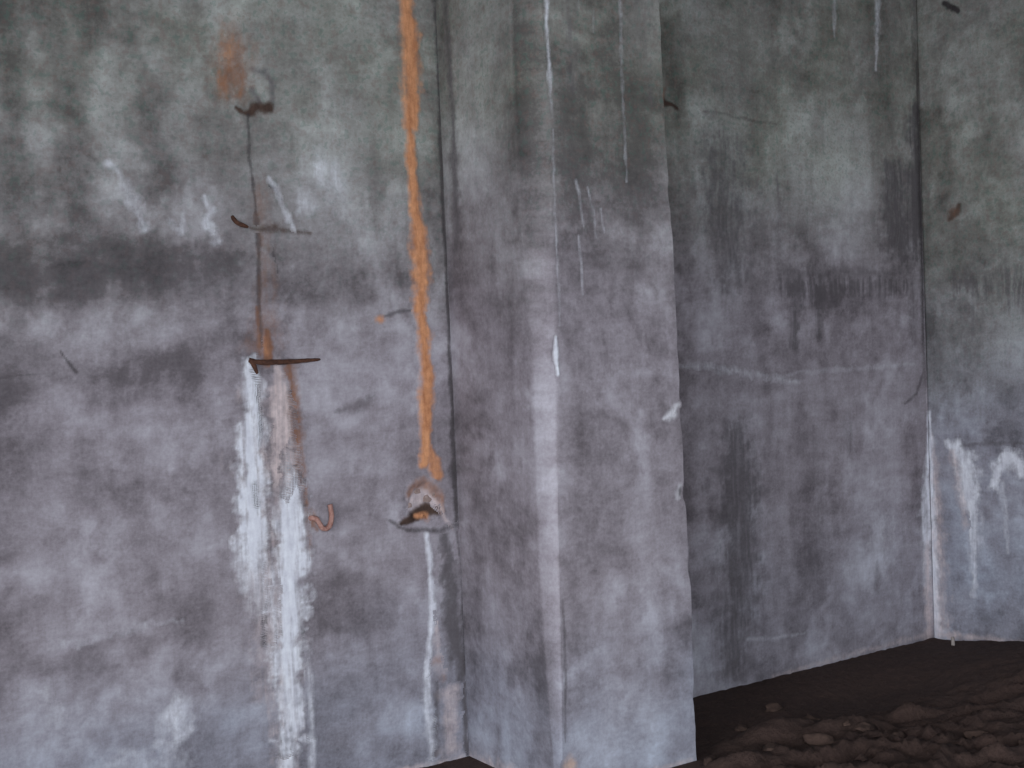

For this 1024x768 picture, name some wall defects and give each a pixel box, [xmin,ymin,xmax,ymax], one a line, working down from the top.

efflorescence [219,352,319,768]
corrosion [231,215,314,236]
corrosion [234,289,321,561]
corrosion [373,0,446,483]
spalling [387,474,458,536]
leakage [542,0,595,377]
leakage [916,409,1024,641]
leakage [944,252,1024,344]